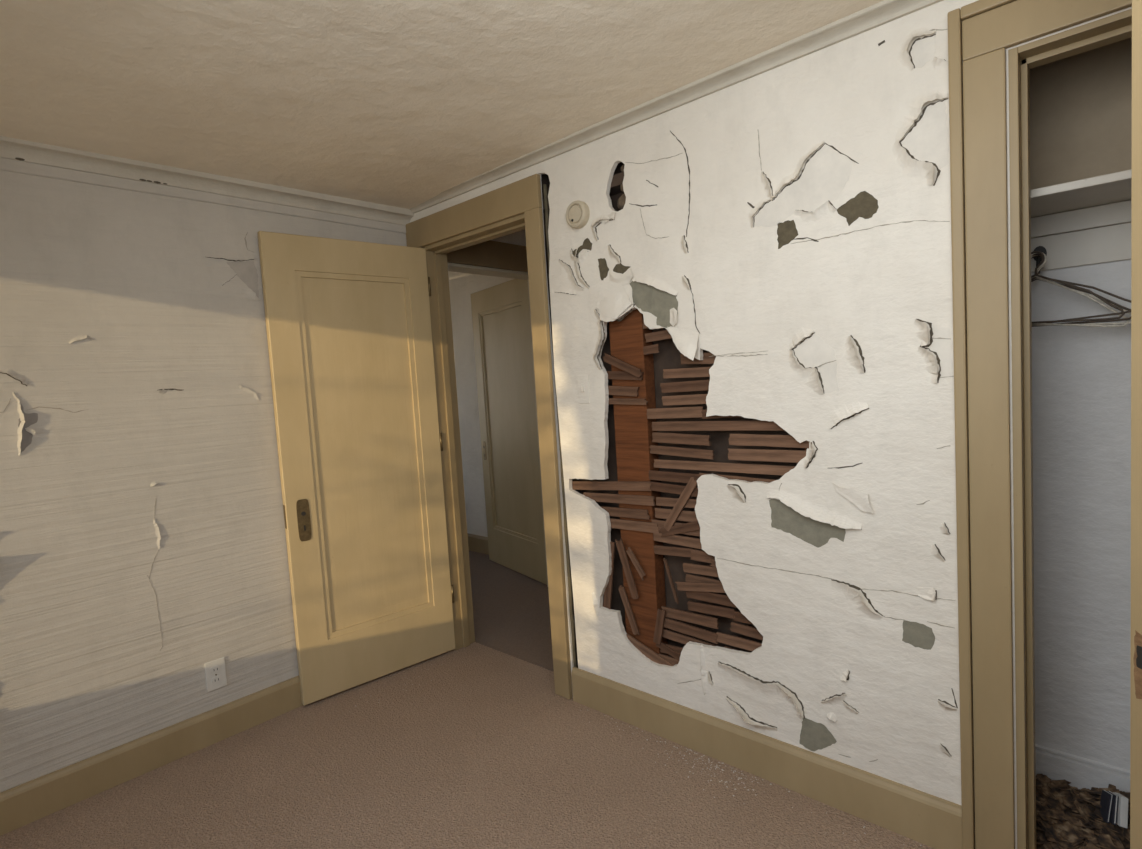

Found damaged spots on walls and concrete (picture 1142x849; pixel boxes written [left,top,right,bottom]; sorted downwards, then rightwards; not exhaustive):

peeling [892,88,949,186]
crack [648,131,768,357]
crack [791,220,950,244]
peeling [0,368,89,455]
flaking render [558,153,862,758]